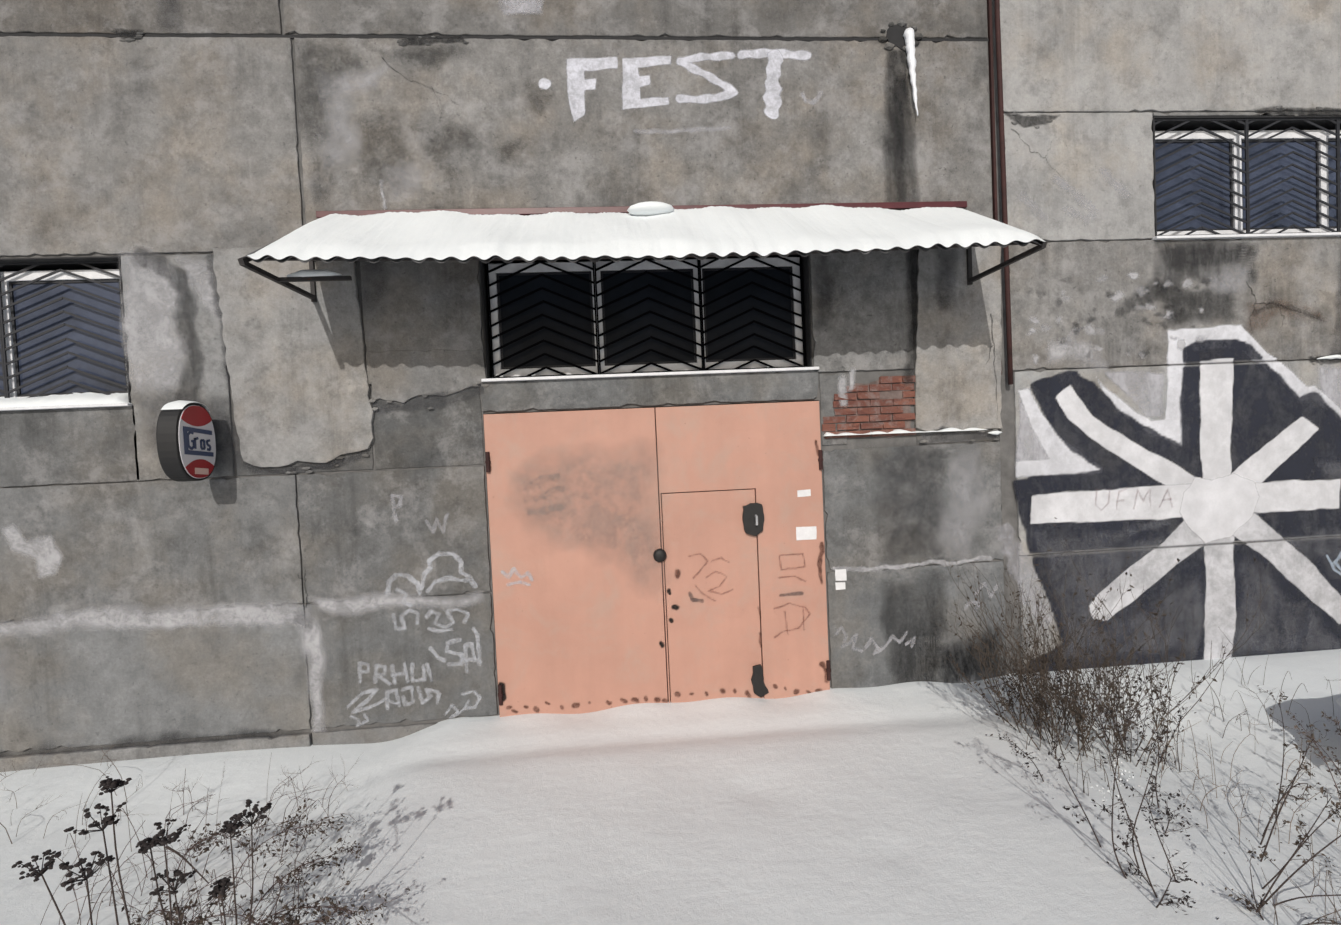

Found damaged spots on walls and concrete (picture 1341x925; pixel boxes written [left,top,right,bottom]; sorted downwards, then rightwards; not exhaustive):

damp [887,50,910,176]
flaking render [822,375,1002,443]
corrosion [499,682,590,713]
corrosion [607,689,750,705]